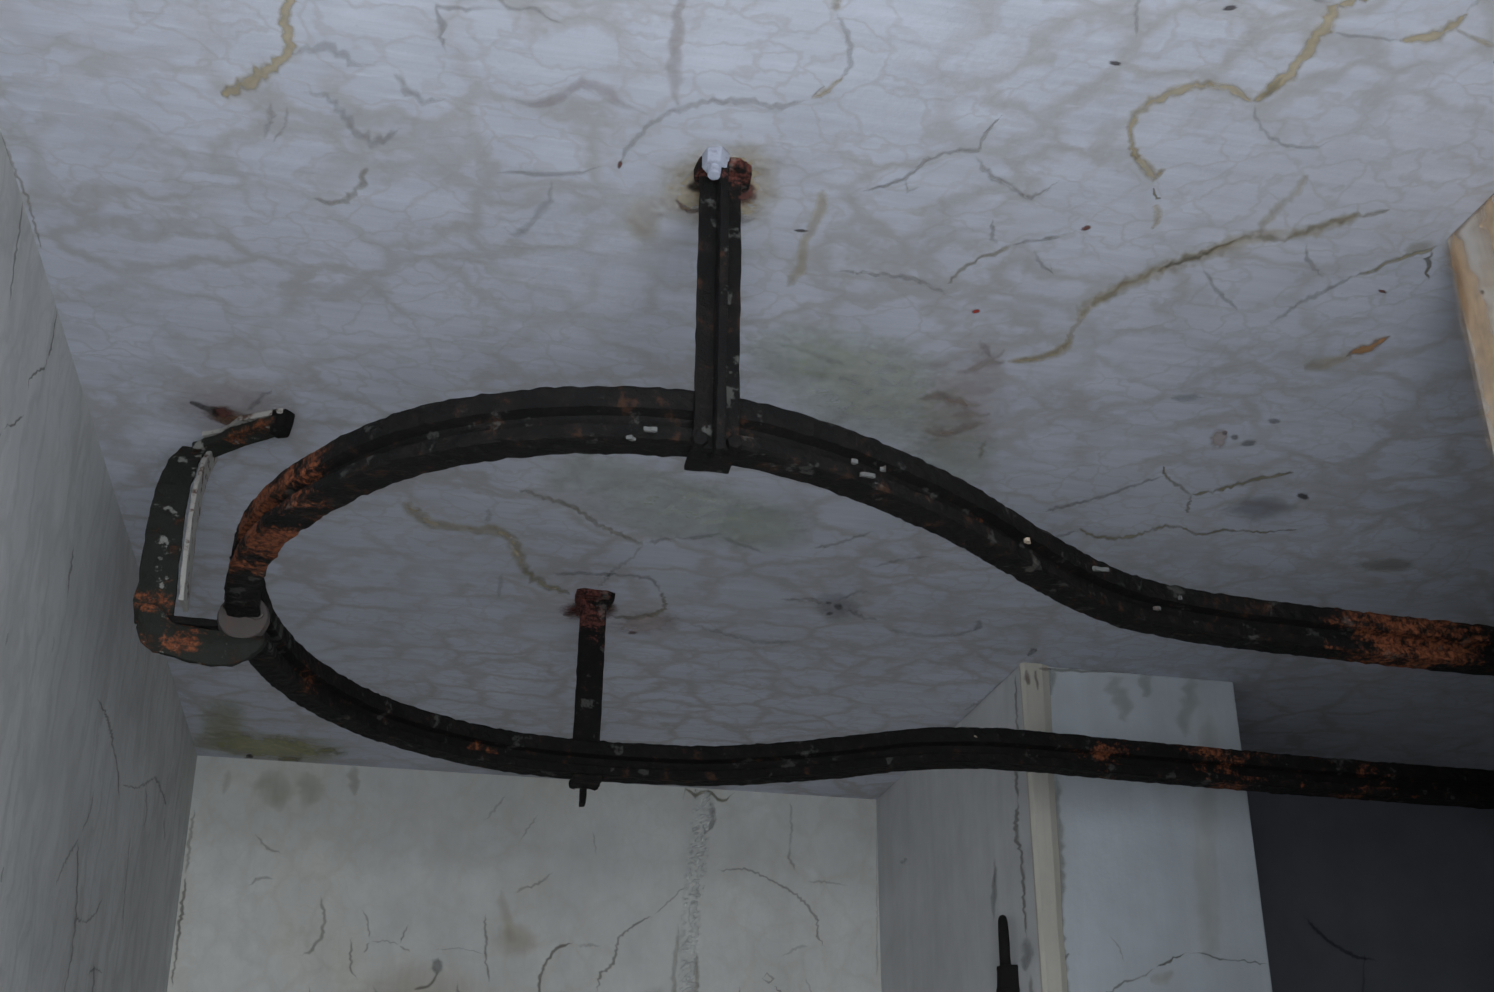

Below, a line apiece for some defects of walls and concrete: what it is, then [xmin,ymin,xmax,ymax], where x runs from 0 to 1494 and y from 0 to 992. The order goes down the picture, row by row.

crack [223,0,295,97]
crack [1404,17,1463,42]
crack [1130,0,1366,157]
corrosion [677,172,700,212]
corrosion [741,159,758,214]
crack [1165,240,1235,267]
crack [1361,249,1432,277]
crack [29,320,56,379]
crack [1080,467,1291,540]
corrosion [563,605,580,618]
crack [622,594,667,620]
crack [538,945,566,992]